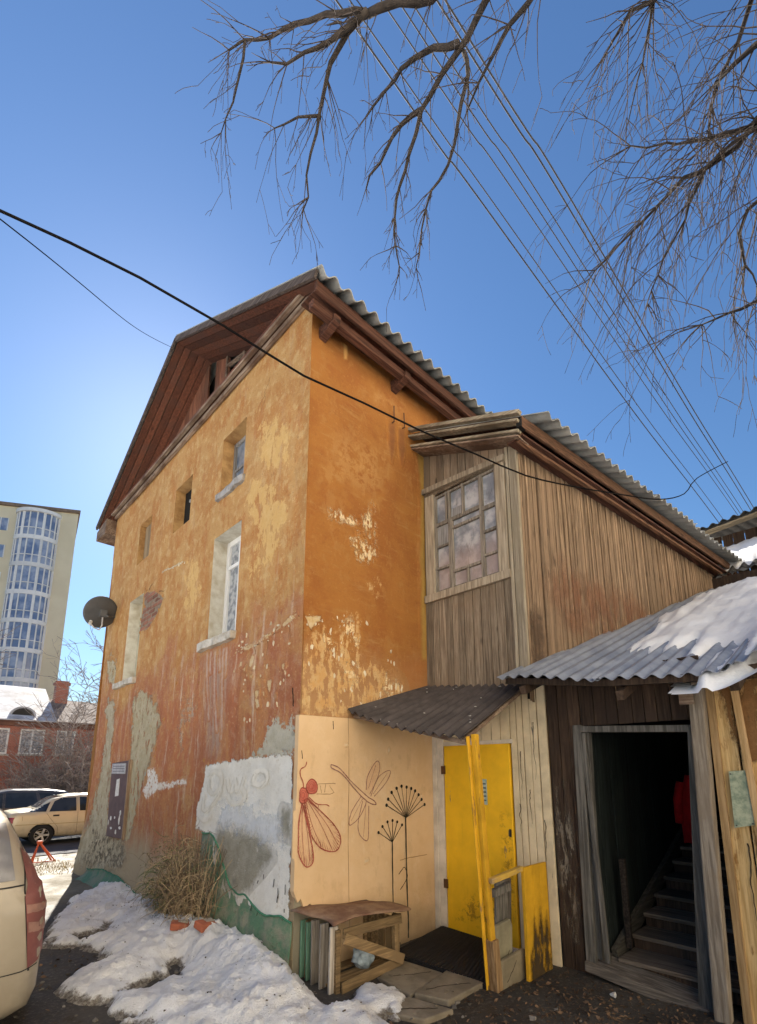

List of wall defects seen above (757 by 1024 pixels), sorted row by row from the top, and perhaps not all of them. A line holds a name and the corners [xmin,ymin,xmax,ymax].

flaking render [139,588,165,634]
flaking render [233,338,427,767]
peeling [73,647,207,878]